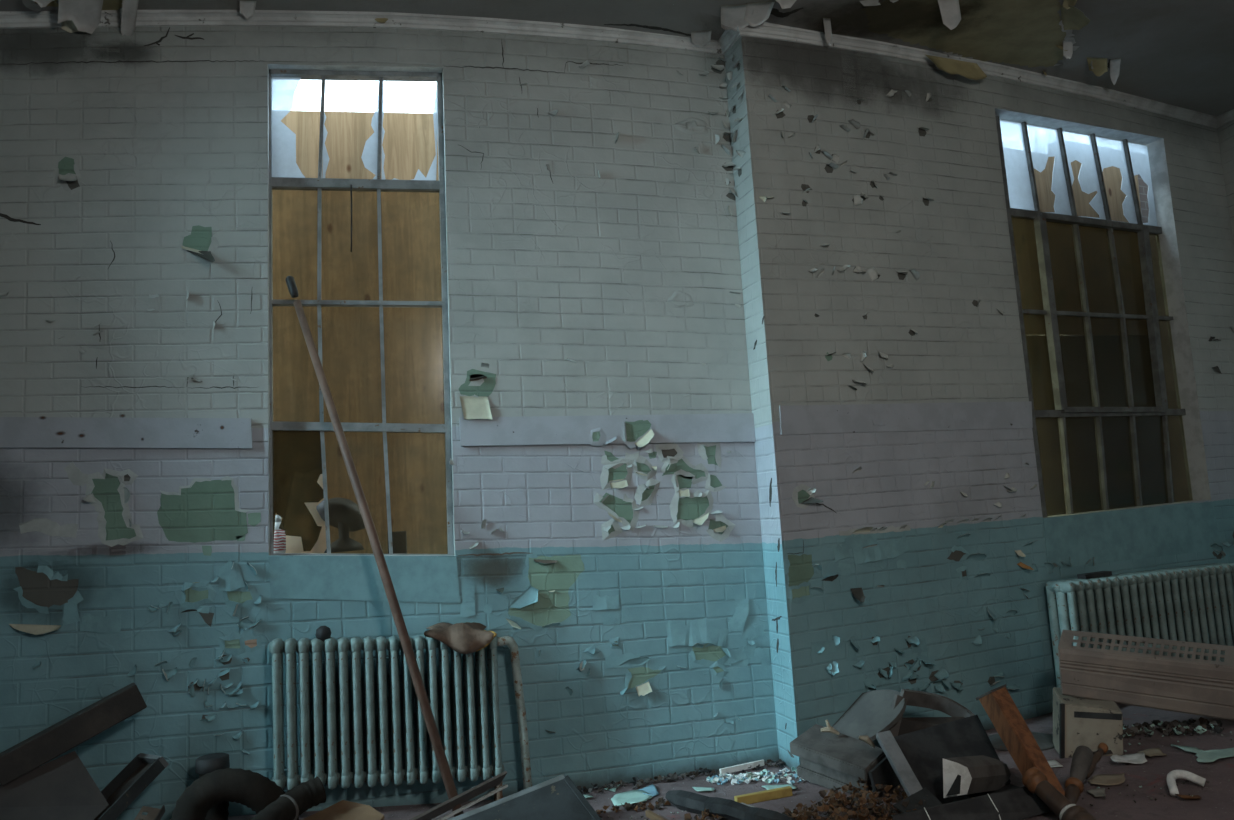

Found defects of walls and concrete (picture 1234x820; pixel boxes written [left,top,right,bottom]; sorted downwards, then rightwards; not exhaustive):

peeling [22,0,139,36]
peeling [604,0,803,47]
peeling [814,0,1121,85]
crack [0,213,41,225]
peeling [179,225,219,262]
peeling [83,468,143,547]
peeling [157,476,261,556]
peeling [588,416,735,542]
peeling [180,559,262,627]
peeling [496,554,585,631]
peeling [576,598,770,696]